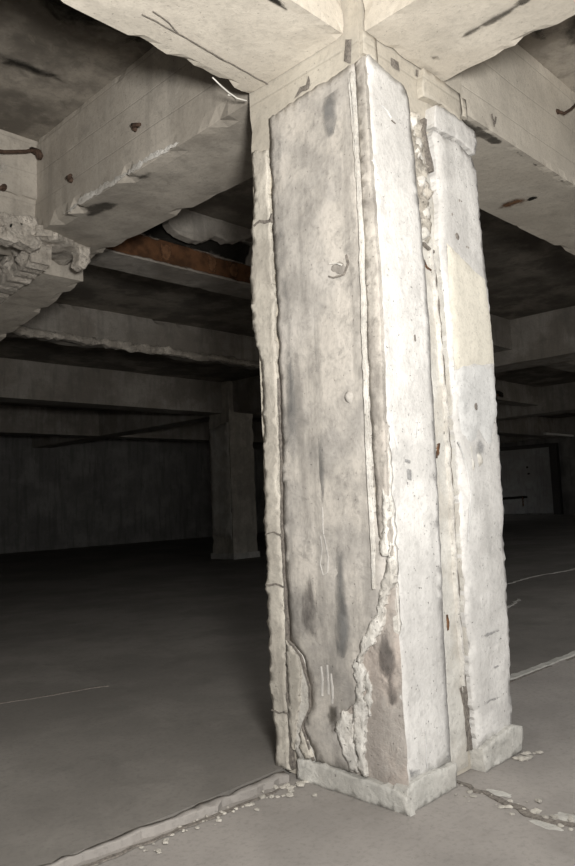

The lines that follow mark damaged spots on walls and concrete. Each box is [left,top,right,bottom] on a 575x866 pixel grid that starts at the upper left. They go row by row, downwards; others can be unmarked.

crack [142,11,268,84]
water stain [464,0,529,36]
spalling [0,147,43,160]
spalling [64,142,178,215]
spalling [410,111,434,243]
spalling [0,212,91,303]
rust [106,234,251,283]
spalling [6,326,260,368]
crack [265,378,290,642]
spalling [334,427,409,786]
crack [271,667,296,769]
crack [457,780,575,831]